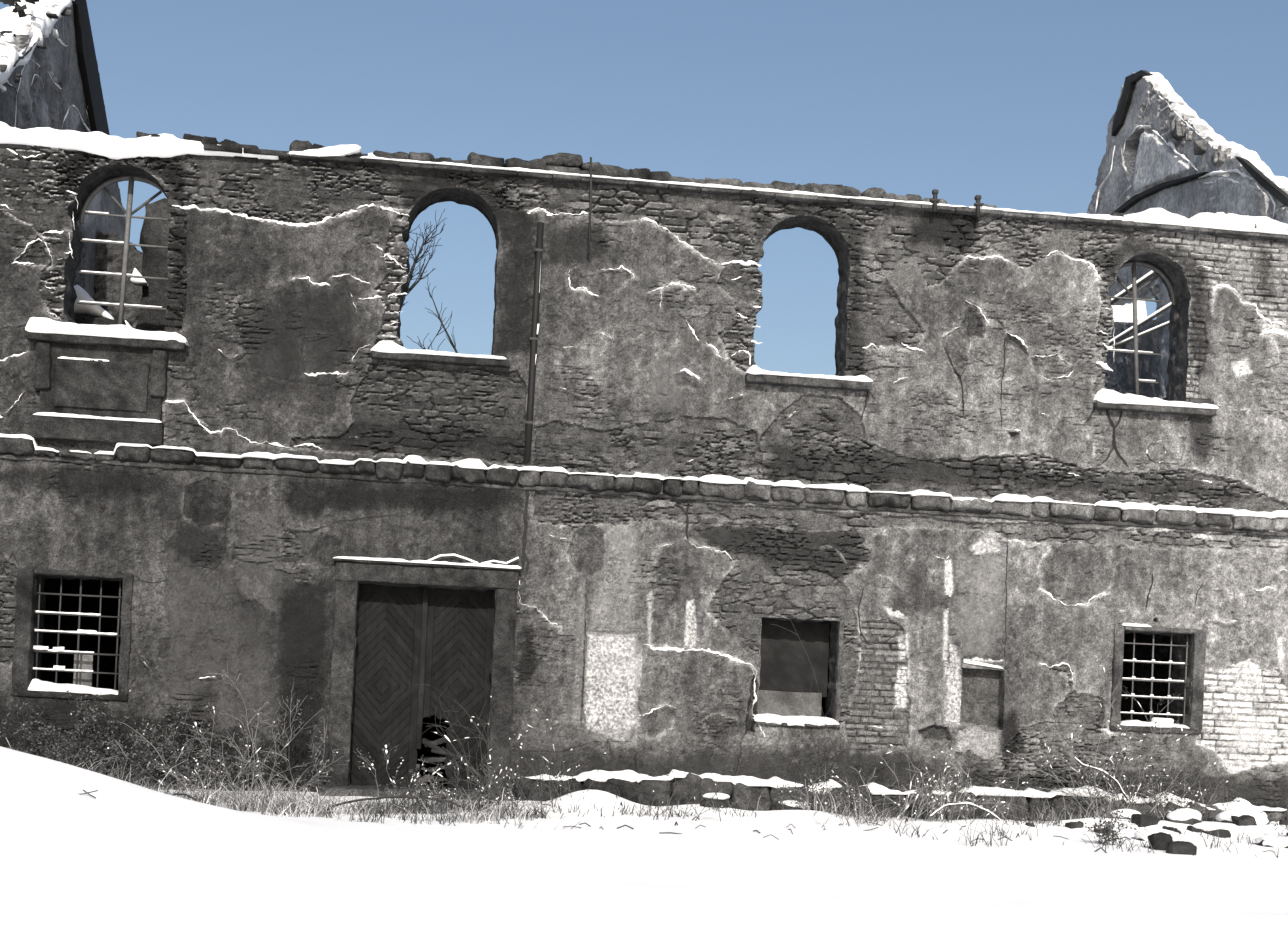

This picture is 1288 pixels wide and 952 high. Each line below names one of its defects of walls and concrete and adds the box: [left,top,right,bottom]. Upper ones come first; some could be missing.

spalling [0,144,1288,512]
crack [944,347,965,415]
crack [998,338,1006,427]
spalling [0,550,18,665]
spalling [185,477,344,635]
spalling [517,581,560,683]
spalling [532,491,1288,790]